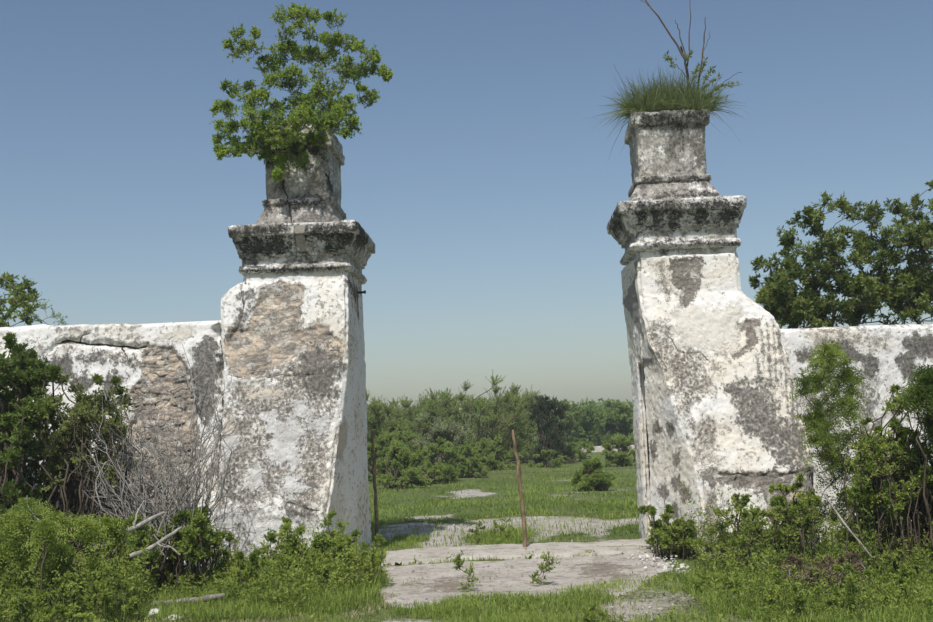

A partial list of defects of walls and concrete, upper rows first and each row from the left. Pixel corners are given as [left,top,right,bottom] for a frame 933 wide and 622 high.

water stain [609,109,745,251]
crack [55,333,146,360]
flaking render [117,342,201,511]
water stain [188,130,369,430]
flaking render [214,278,349,555]
flaking render [652,255,708,308]
water stain [684,410,726,473]
water stain [719,319,836,471]
water stain [817,326,933,430]